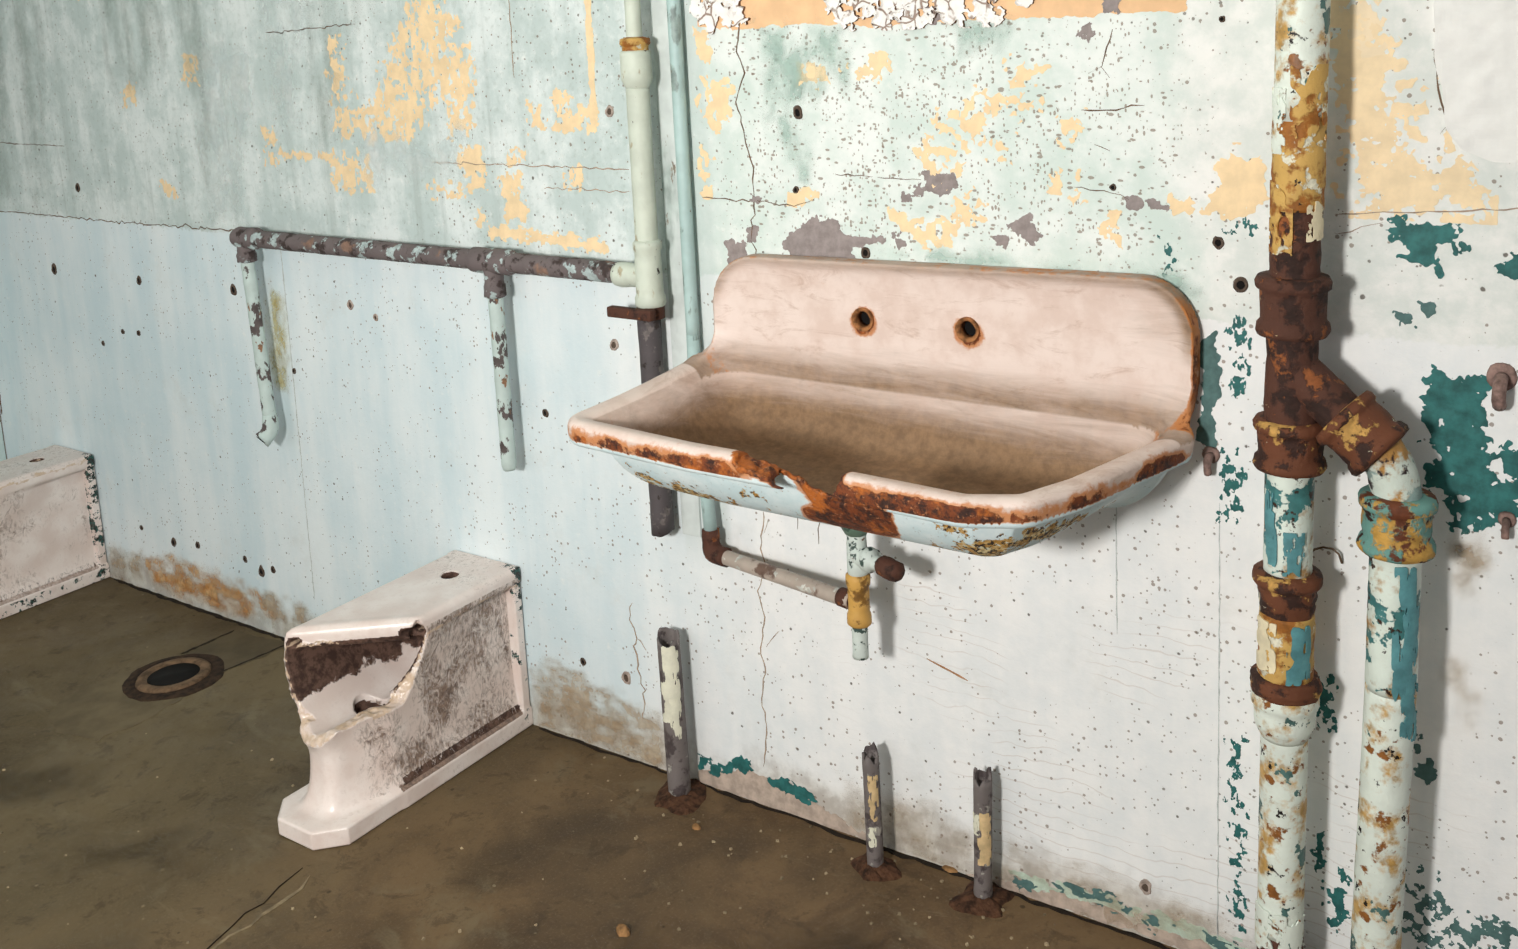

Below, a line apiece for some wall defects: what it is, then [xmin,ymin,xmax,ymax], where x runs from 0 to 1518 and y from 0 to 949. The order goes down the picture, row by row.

crack [702,23,921,254]
peeling [782,53,1088,259]
peeling [689,0,1187,200]
peeling [1097,0,1499,279]
peeling [1417,364,1518,535]
crack [114,579,285,671]
crack [207,867,310,949]
water stain [263,594,305,623]
water stain [541,669,662,766]
flaking render [697,753,879,848]
crack [539,512,1170,949]
flaking render [942,735,1305,949]